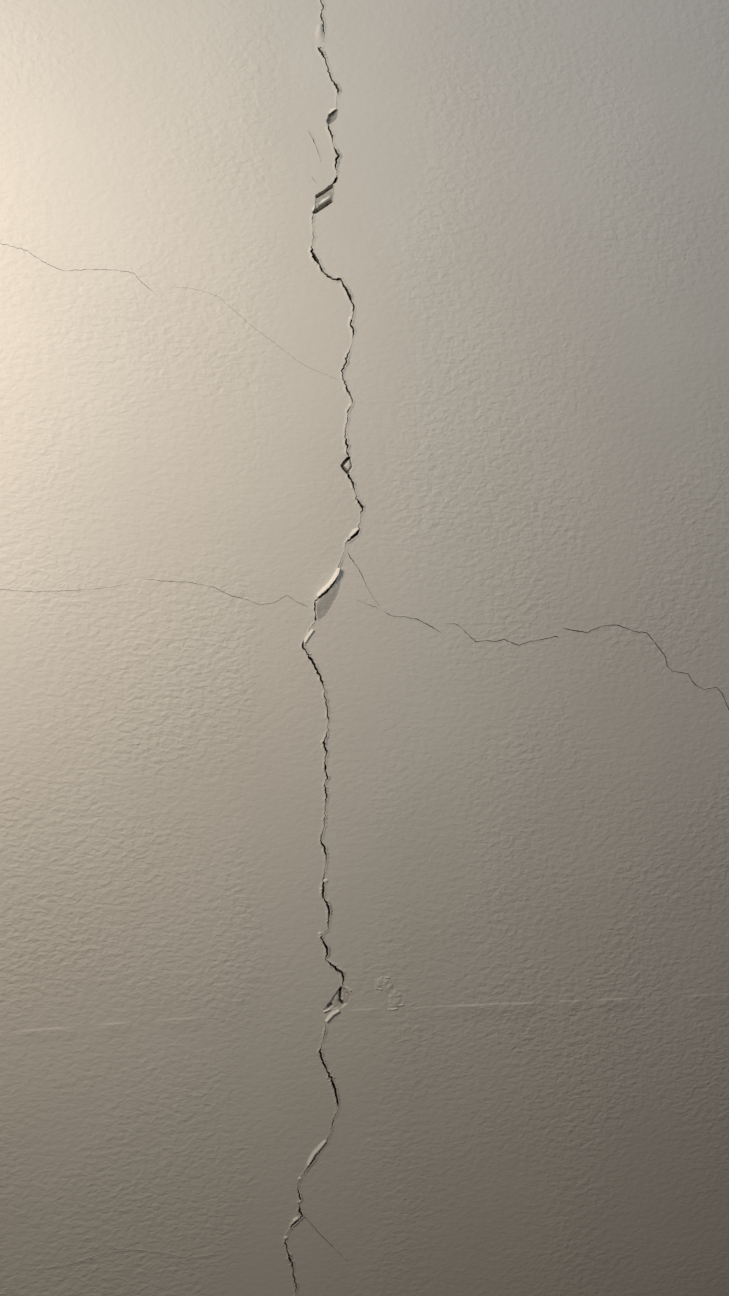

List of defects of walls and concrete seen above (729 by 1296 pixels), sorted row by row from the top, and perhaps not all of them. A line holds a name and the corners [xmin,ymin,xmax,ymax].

crack [0,0,729,712]
crack [0,578,347,987]
crack [282,1024,349,1296]